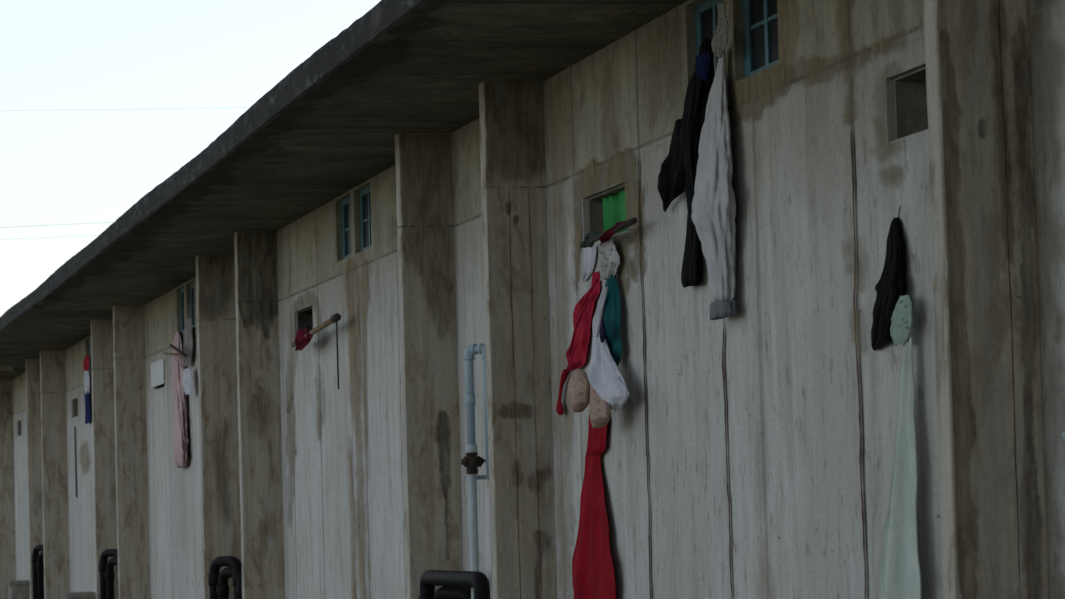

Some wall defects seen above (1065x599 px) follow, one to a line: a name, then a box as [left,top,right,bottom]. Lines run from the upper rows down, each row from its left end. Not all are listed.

damp [33,4,441,309]
damp [437,411,450,537]